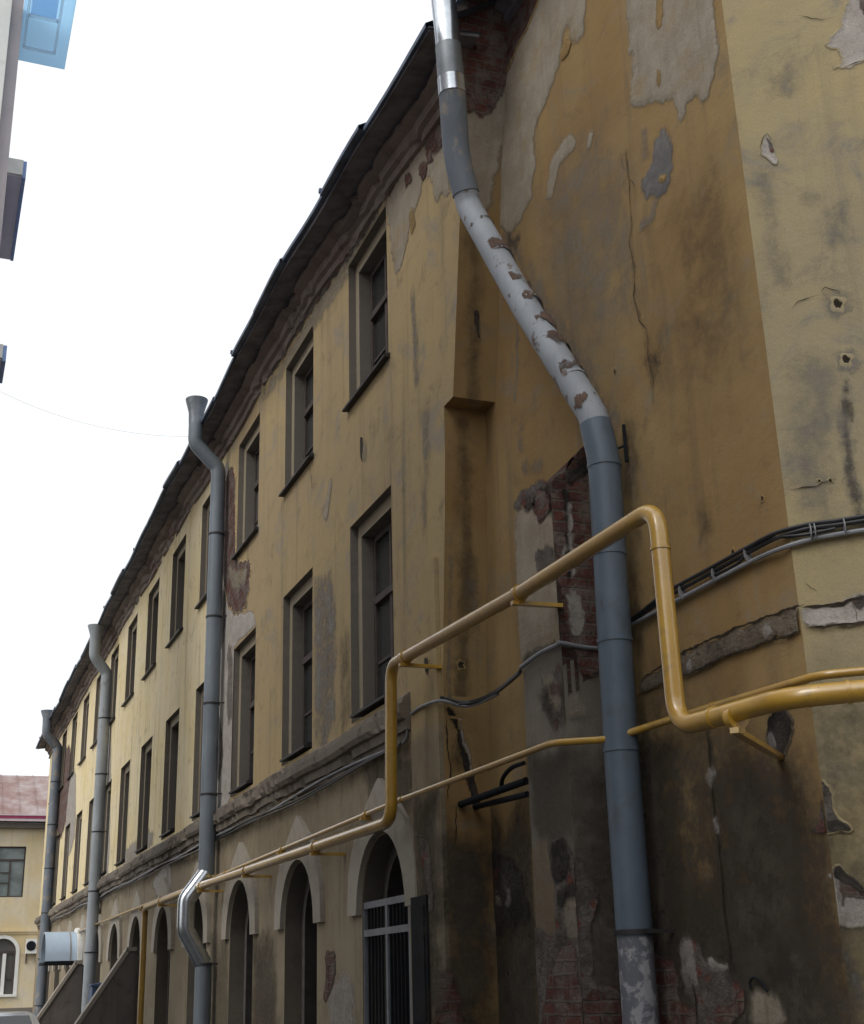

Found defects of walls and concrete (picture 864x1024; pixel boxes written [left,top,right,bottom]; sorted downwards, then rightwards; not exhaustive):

flaking render [457,0,593,233]
flaking render [626,0,719,121]
flaking render [262,121,450,398]
crack [621,153,654,399]
flaking render [216,462,256,809]
flaking render [514,458,592,584]
flaking render [518,558,599,676]
spalling [802,593,864,626]
crack [446,707,480,847]
damp [415,797,539,1024]
damp [570,778,620,993]
flaking render [654,939,785,1024]